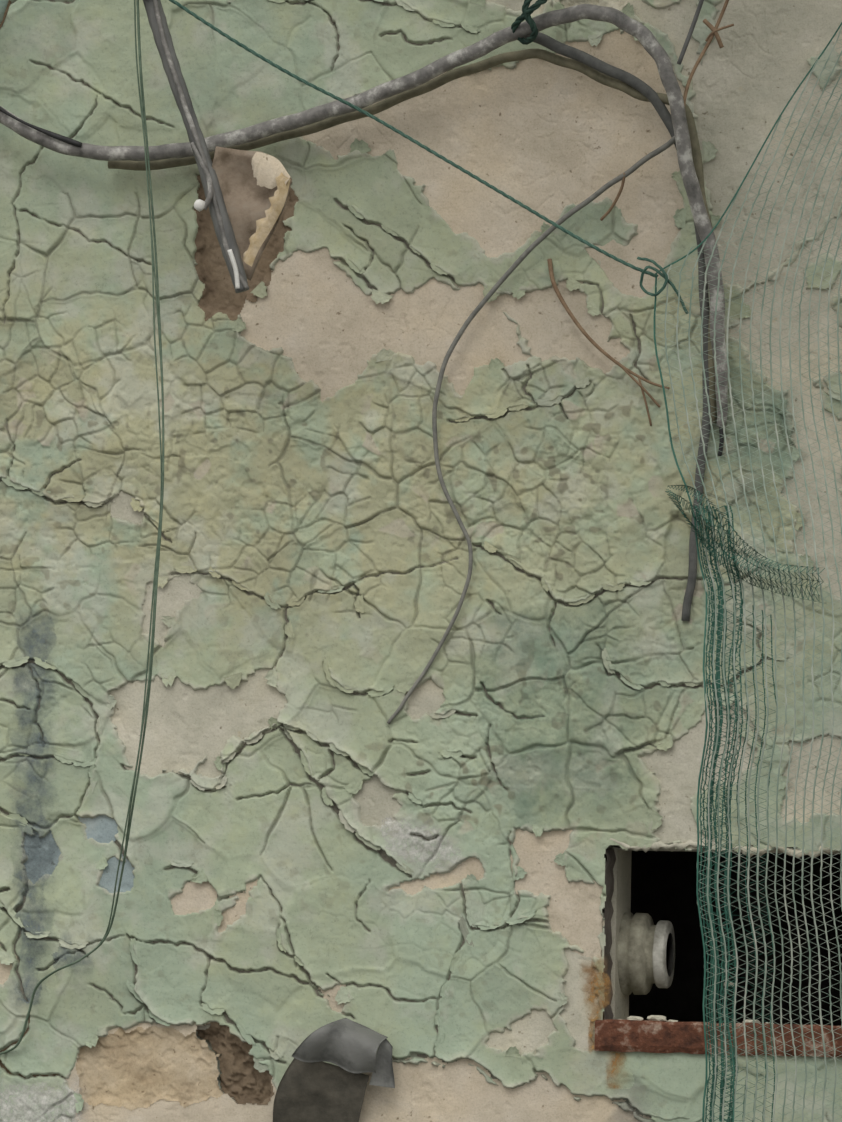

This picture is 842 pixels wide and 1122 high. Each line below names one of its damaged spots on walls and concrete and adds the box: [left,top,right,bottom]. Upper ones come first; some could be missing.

crack [336,196,455,290]
peeling [194,175,630,402]
peeling [302,29,687,298]
peeling [470,0,842,598]
crack [149,517,758,659]
crack [0,656,127,818]
crack [183,724,414,877]
spalling [629,693,842,1026]
spalling [65,1018,276,1122]
crack [0,885,538,1078]
peeling [359,1057,651,1122]
rust [585,965,610,1050]